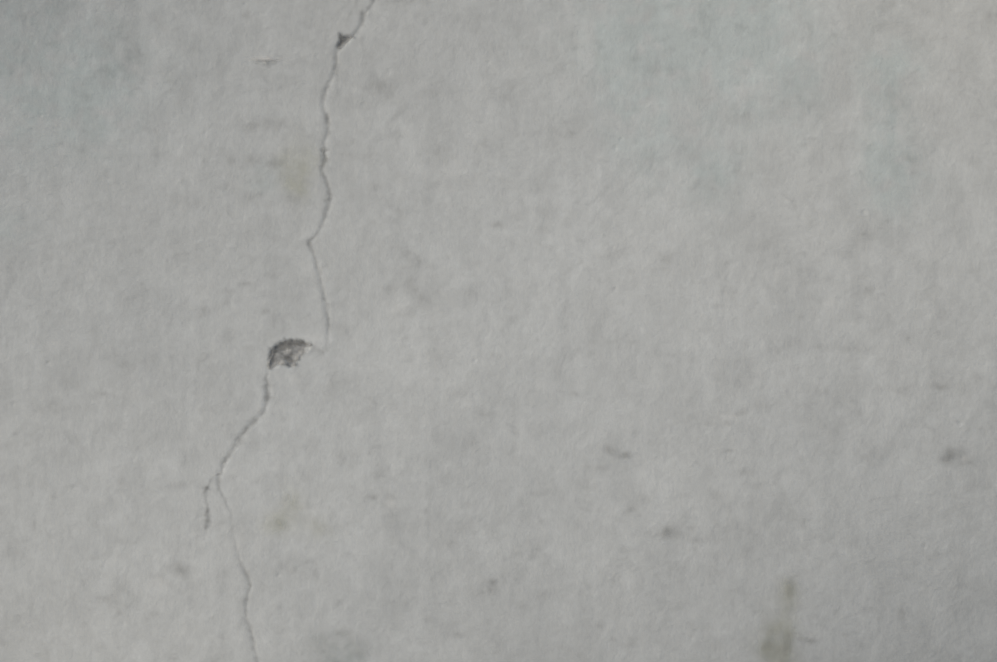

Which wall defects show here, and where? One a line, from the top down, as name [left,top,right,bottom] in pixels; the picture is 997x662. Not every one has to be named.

spalling [267,339,311,369]